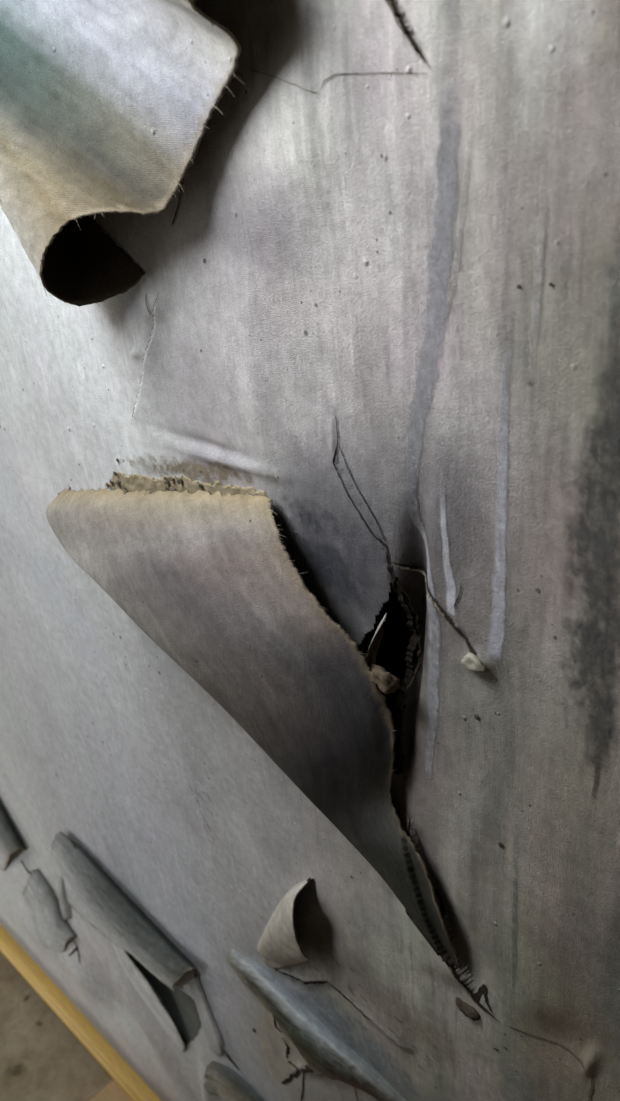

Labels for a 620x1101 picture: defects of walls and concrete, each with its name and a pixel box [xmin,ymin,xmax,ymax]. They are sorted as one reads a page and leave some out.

peeling [105,459,268,497]
crack [333,410,396,592]
water stain [568,359,620,763]
peeling [126,952,201,1046]
peeling [252,1011,309,1083]